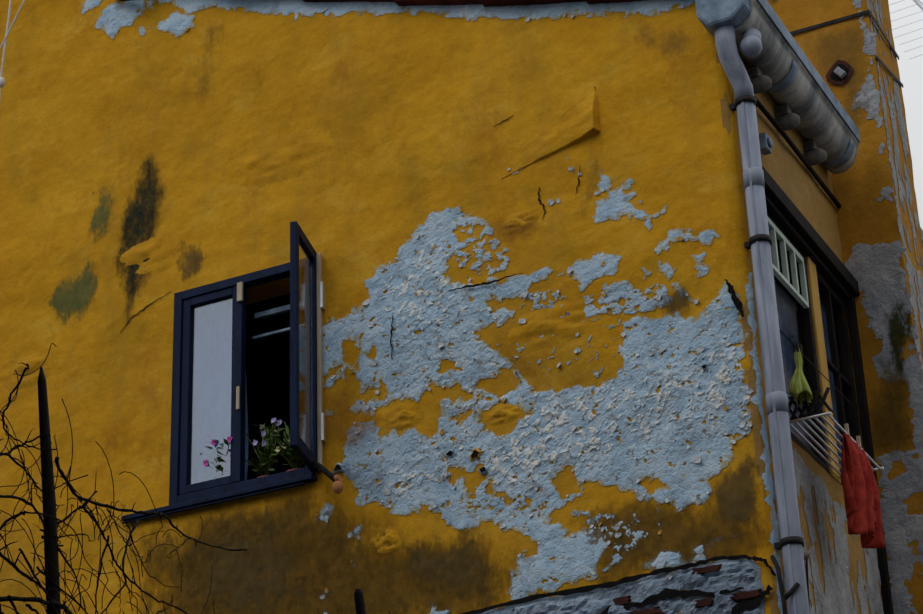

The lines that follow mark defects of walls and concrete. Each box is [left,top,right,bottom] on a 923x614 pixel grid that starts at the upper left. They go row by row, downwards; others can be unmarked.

peeling [80,0,695,39]
peeling [592,170,667,231]
water stain [177,248,202,278]
peeling [792,0,923,614]
peeling [322,206,786,614]
peeling [315,502,334,523]